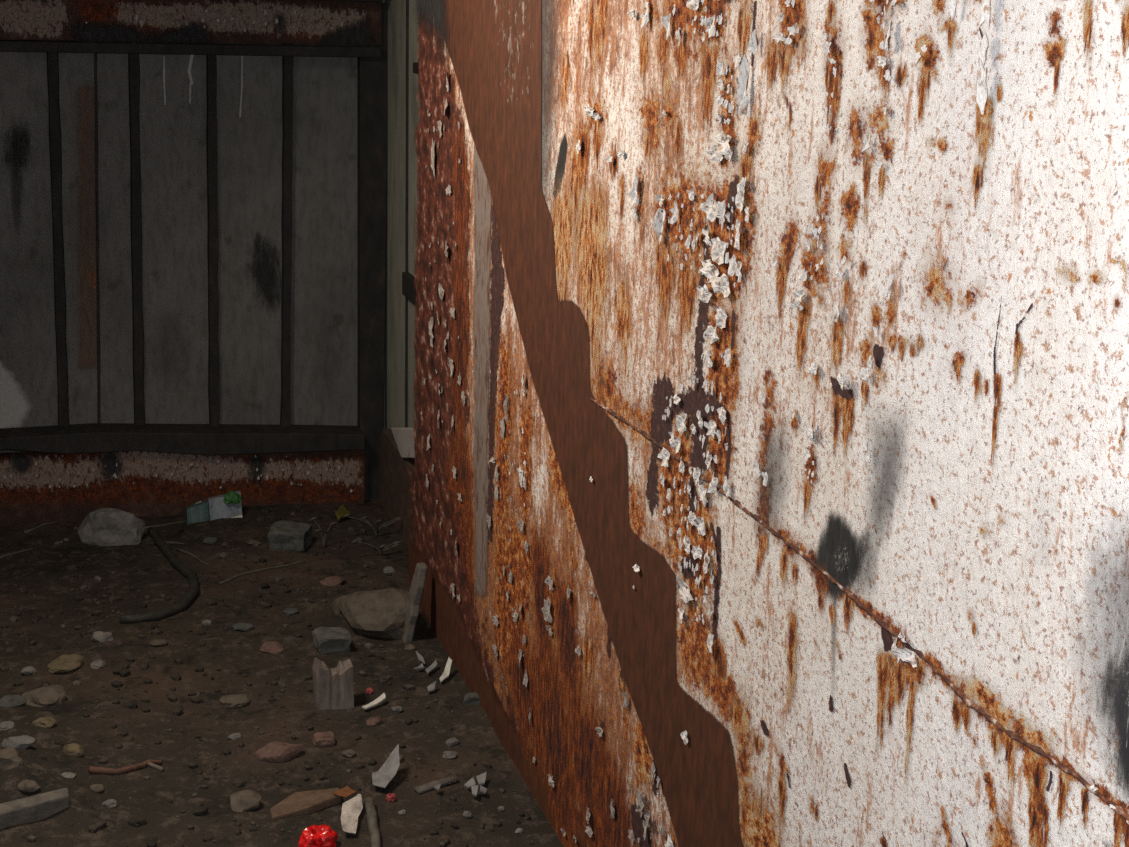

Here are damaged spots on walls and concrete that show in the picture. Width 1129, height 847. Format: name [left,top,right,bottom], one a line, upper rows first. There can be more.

corrosion [1045,0,1066,95]
corrosion [1083,0,1093,64]
corrosion [767,0,957,379]
peeling [645,0,759,653]
crack [723,310,736,368]
corrosion [917,255,982,312]
corrosion [1058,259,1127,286]
corrosion [408,0,790,847]
crack [720,403,731,498]
corrosion [951,351,1002,463]
corrosion [787,605,799,714]
corrosion [924,651,1129,847]